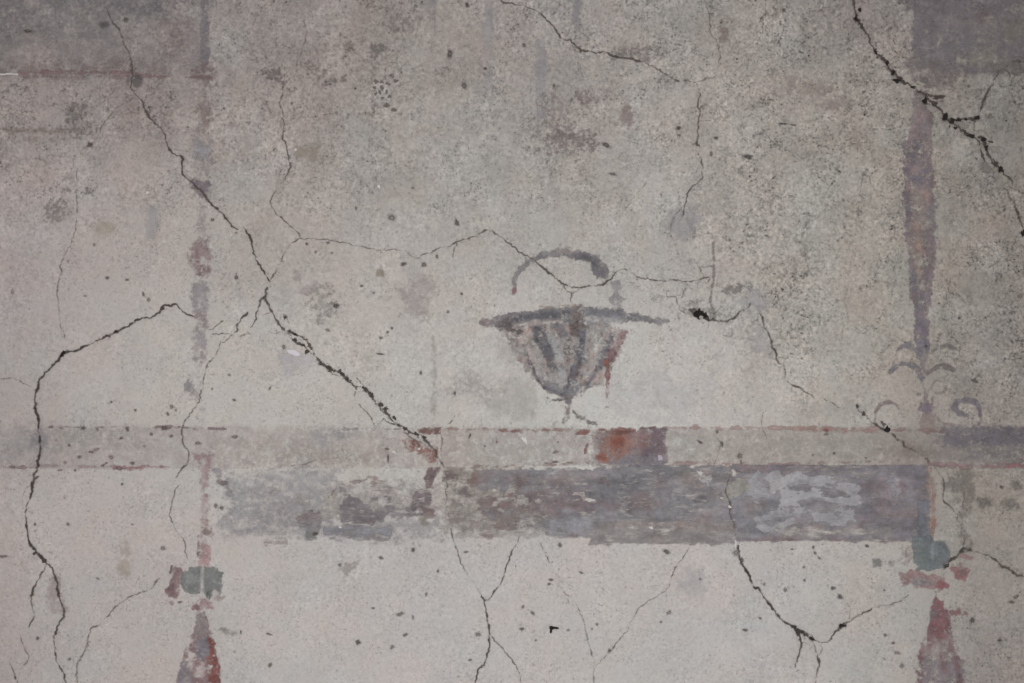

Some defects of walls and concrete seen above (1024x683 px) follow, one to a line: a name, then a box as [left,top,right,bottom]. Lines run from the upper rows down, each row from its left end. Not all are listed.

crack [501,1,710,215]
crack [852,0,1024,236]
crack [3,10,455,683]
crack [422,229,928,460]
crack [475,539,548,683]
crack [725,479,906,683]
crack [942,479,1024,577]